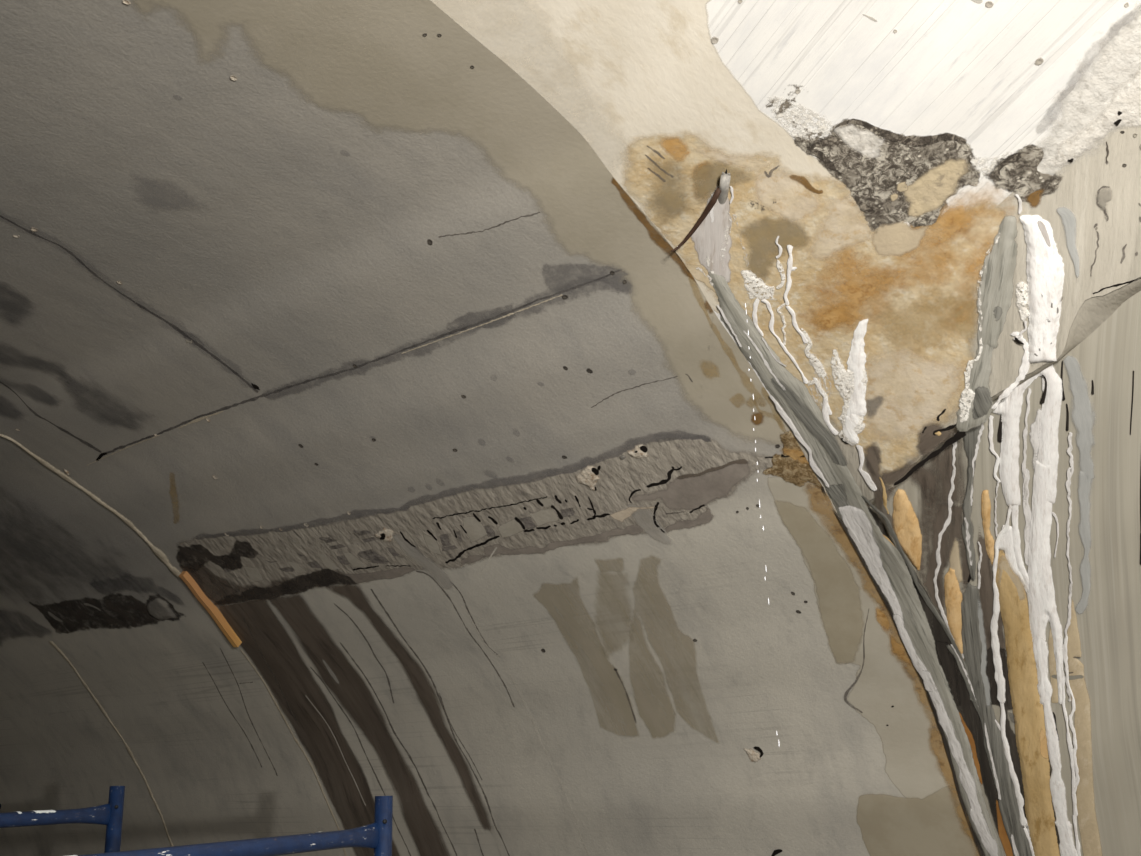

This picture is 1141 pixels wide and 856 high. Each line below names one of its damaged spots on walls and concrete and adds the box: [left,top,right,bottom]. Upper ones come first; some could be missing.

peeling [835,126,883,157]
leakage [1037,10,1141,176]
crack [103,269,621,456]
rust [612,135,1005,485]
crack [1091,203,1141,294]
spalling [178,431,773,606]
leakage [655,151,1095,856]
leakage [29,593,183,633]
leakage [177,535,514,856]
rust [808,480,981,856]